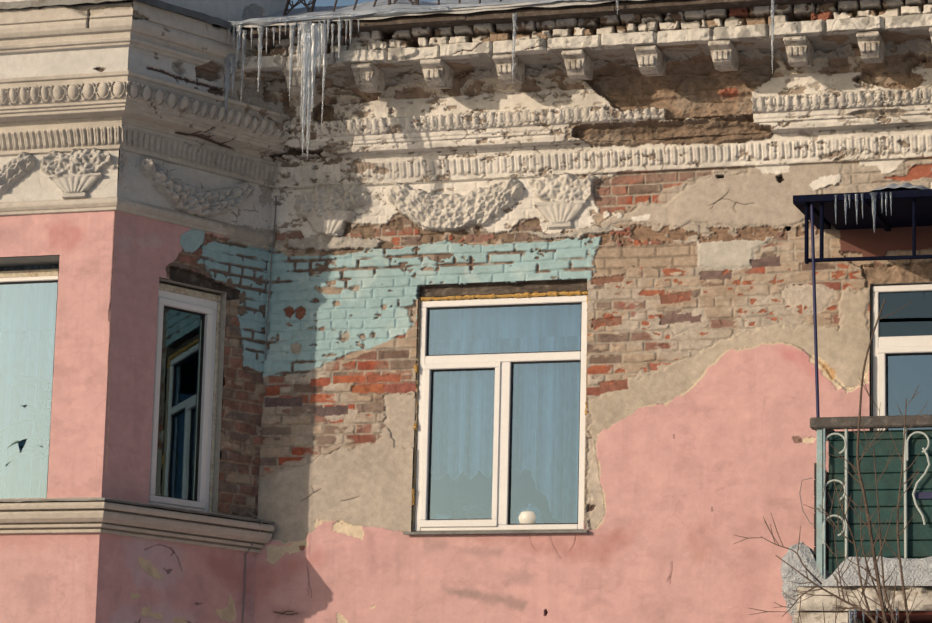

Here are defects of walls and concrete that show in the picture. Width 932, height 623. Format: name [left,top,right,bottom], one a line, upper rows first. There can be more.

crack [106,212,116,470]
spalling [166,156,932,564]